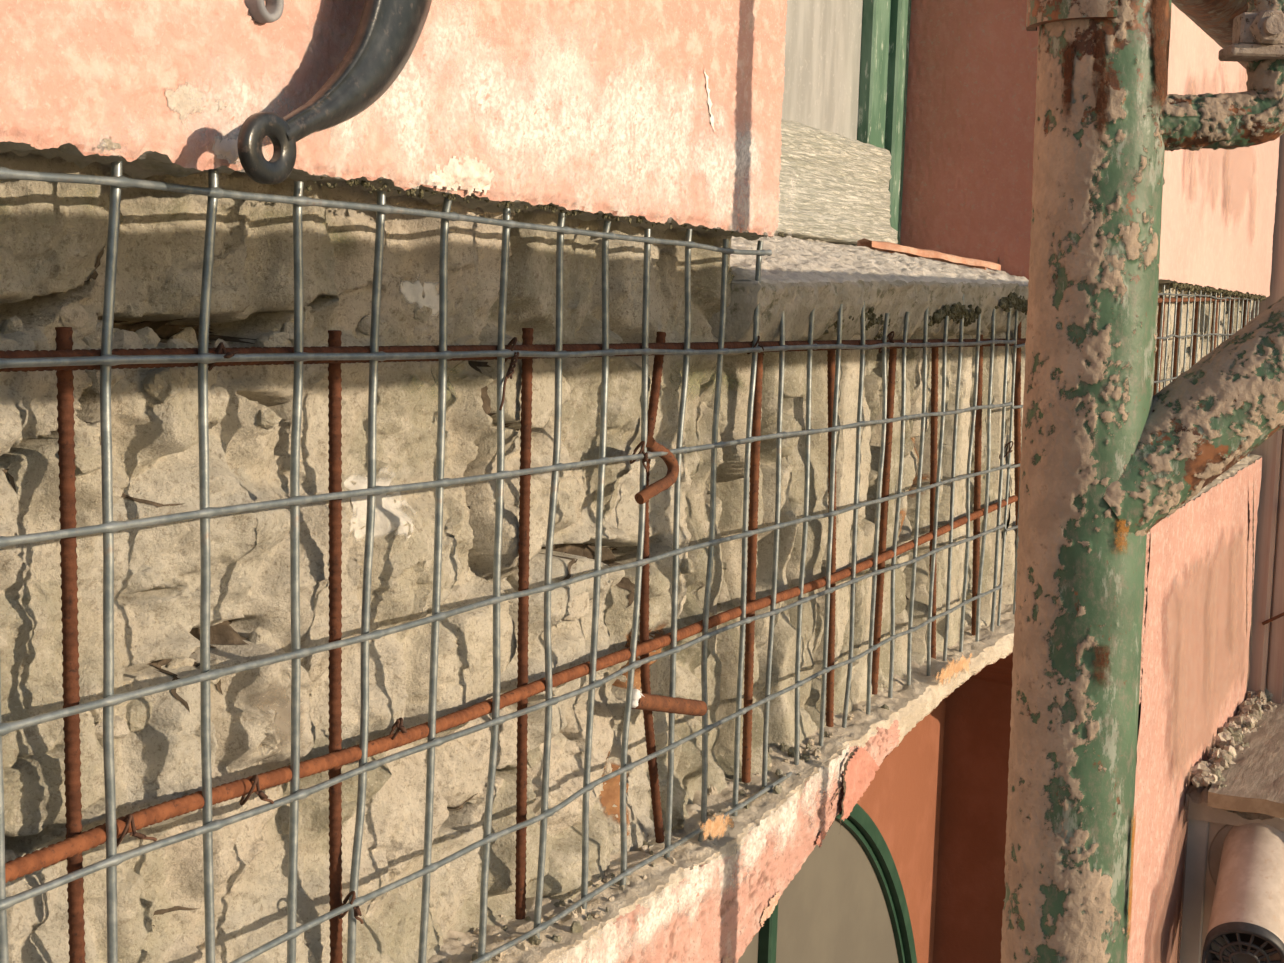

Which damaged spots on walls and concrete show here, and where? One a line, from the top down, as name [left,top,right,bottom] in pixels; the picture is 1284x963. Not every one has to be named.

corrosion [1061,43,1076,113]
corrosion [1092,32,1110,132]
corrosion [1151,0,1167,105]
crack [84,246,105,282]
crack [113,319,257,344]
spalling [1153,283,1253,396]
spalling [0,136,1027,963]
corrosion [612,625,665,690]
corrosion [599,751,630,836]